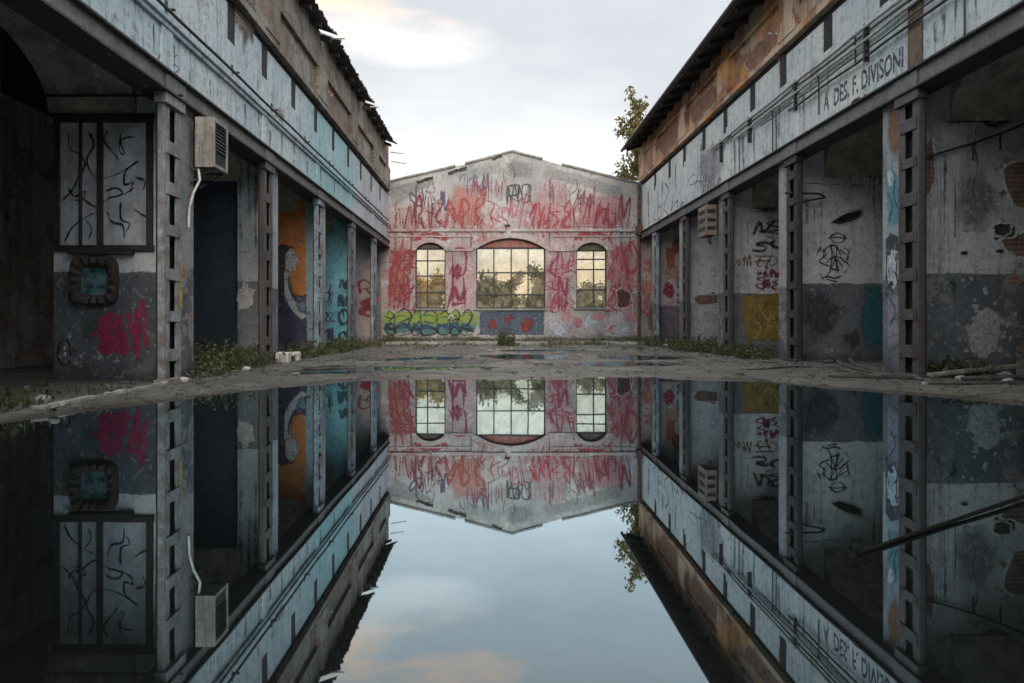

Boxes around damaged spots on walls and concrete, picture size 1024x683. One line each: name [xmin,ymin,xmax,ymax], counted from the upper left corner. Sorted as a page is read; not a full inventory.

peeling [994,157,1024,210]
spalling [830,208,864,226]
peeling [990,220,1024,261]
peeling [237,282,255,310]
peeling [614,284,645,321]
peeling [956,286,1017,367]